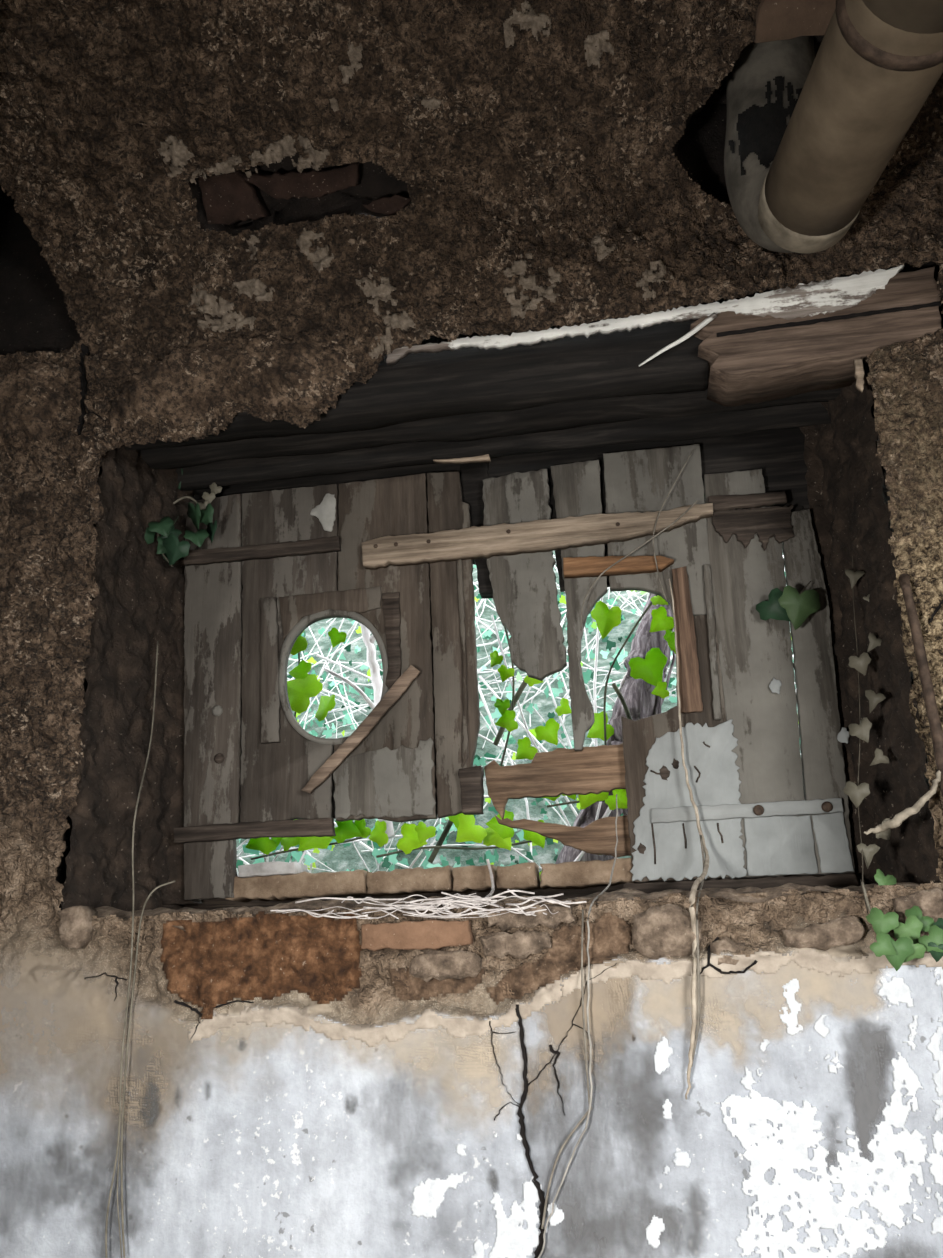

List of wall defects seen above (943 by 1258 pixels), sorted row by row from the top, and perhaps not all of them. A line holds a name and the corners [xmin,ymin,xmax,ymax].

spalling [157,134,412,273]
peeling [160,911,943,1258]
crack [489,964,616,1258]
leakage [527,944,890,1258]